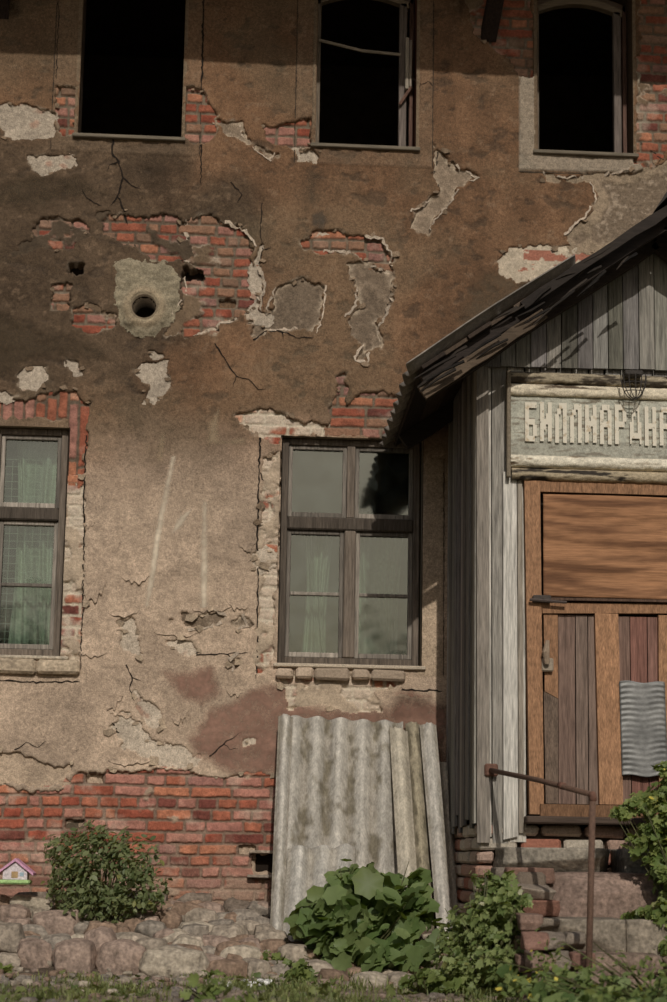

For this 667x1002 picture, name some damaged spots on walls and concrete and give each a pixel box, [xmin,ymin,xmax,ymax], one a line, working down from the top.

crack [198,0,206,86]
spalling [465,0,533,78]
peeling [0,87,76,141]
crack [82,139,140,224]
peeling [410,145,480,234]
peeling [497,0,667,283]
spalling [10,209,327,339]
peeling [301,229,400,367]
spalling [0,359,91,661]
spalling [166,373,402,713]
peeling [116,617,143,661]
spalling [0,690,276,906]